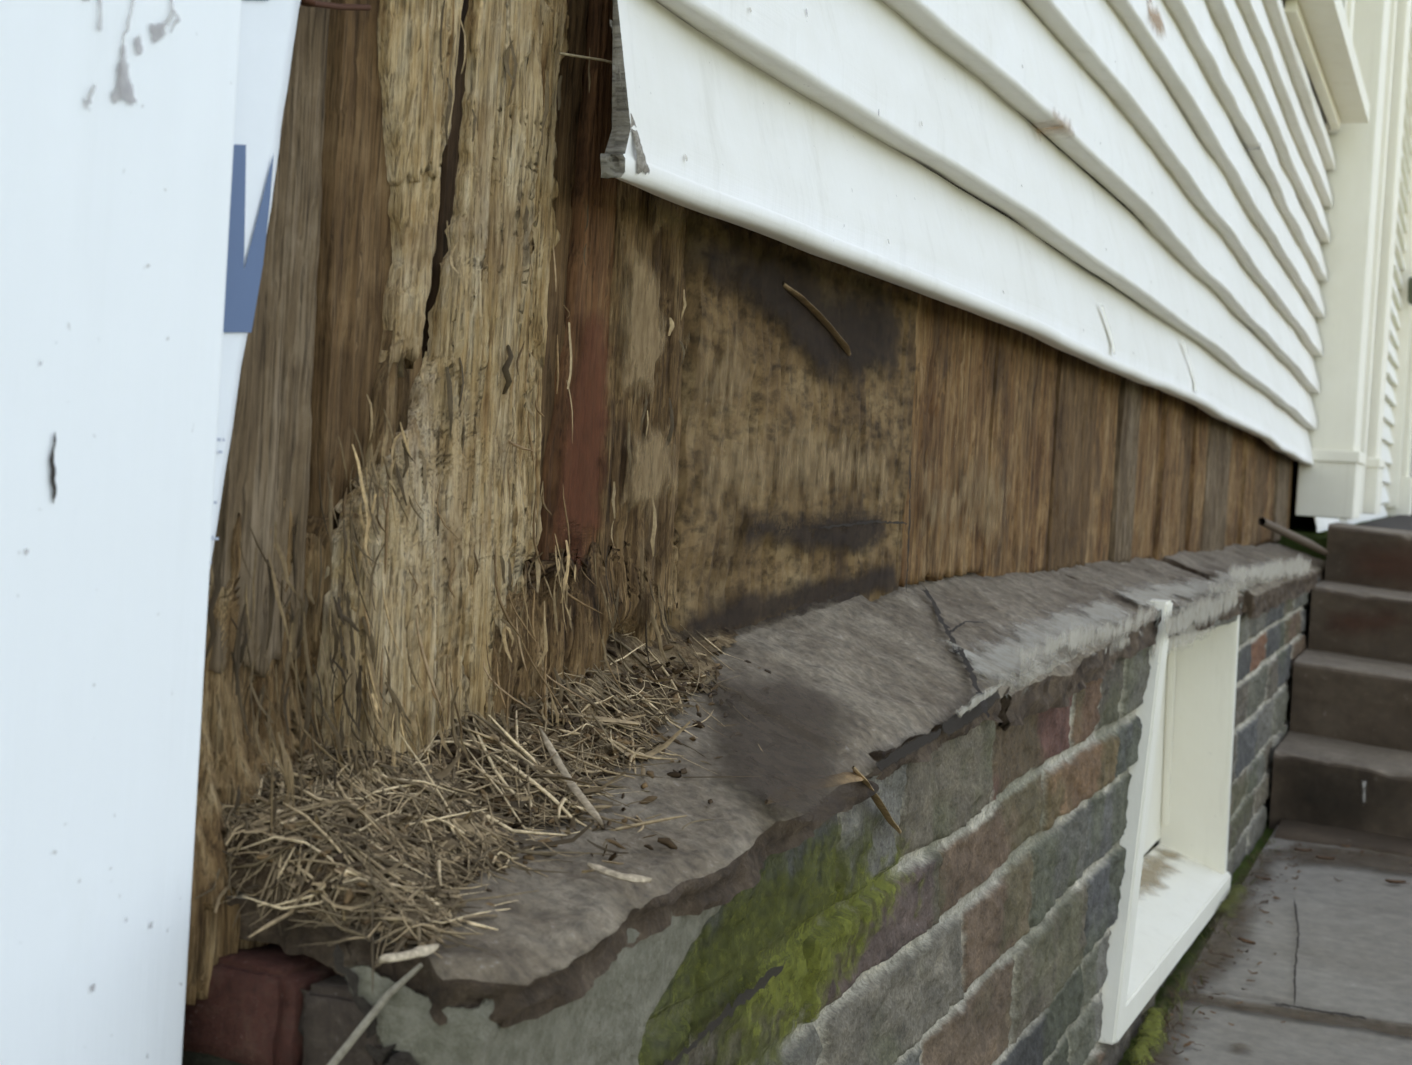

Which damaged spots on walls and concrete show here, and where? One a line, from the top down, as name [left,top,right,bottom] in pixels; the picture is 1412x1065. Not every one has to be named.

peeling [112,0,180,104]
water stain [699,241,900,382]
crack [49,432,57,504]
water stain [746,505,885,552]
water stain [687,565,897,636]
crack [821,452,989,718]
water stain [718,677,850,821]